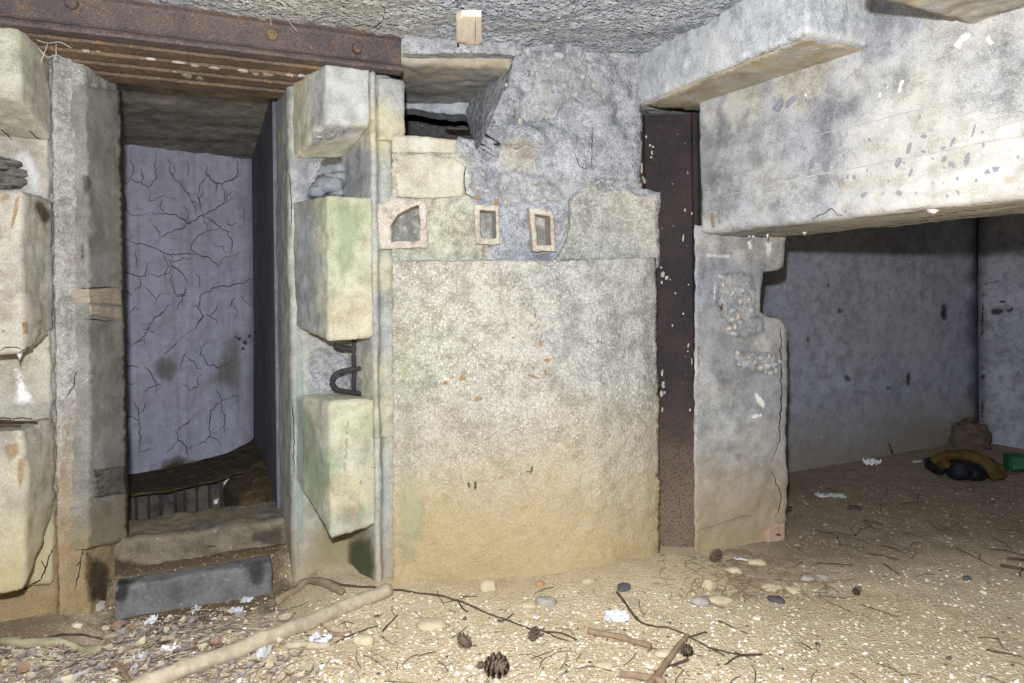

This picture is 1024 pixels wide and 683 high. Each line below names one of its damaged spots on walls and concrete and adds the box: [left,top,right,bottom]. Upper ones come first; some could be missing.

spalling [504,44,611,125]
spalling [470,168,563,207]
crack [81,149,252,457]
spalling [717,272,764,338]
spalling [735,350,782,375]
crack [697,328,783,532]